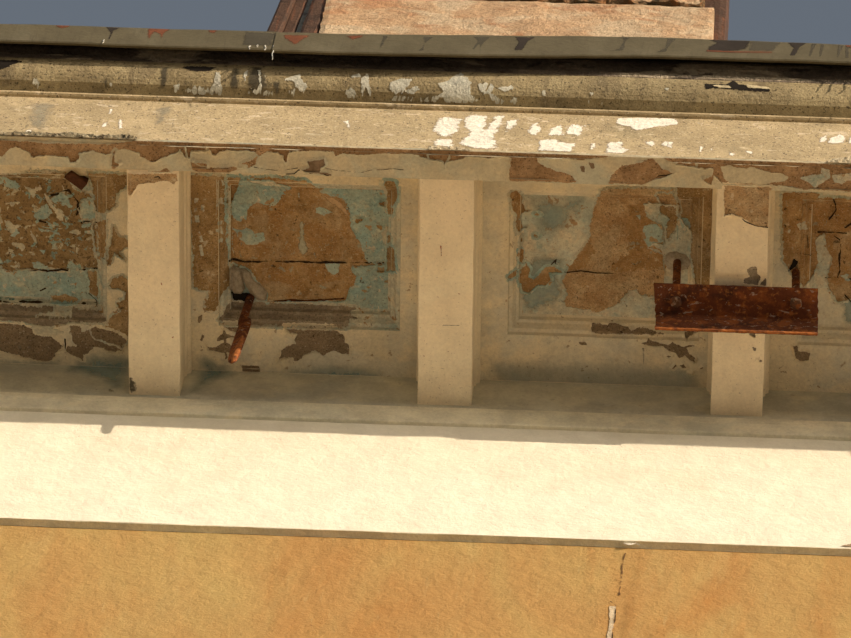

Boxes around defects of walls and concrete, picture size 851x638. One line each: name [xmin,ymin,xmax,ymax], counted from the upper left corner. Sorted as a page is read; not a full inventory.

peeling [173,66,222,95]
peeling [244,70,273,96]
peeling [285,74,307,96]
peeling [345,73,371,99]
peeling [390,73,517,104]
spalling [705,81,770,92]
crack [229,257,384,265]
peeling [0,115,851,376]
crack [800,199,851,302]
crack [275,296,344,304]
rust [655,327,818,335]
crack [603,553,626,638]